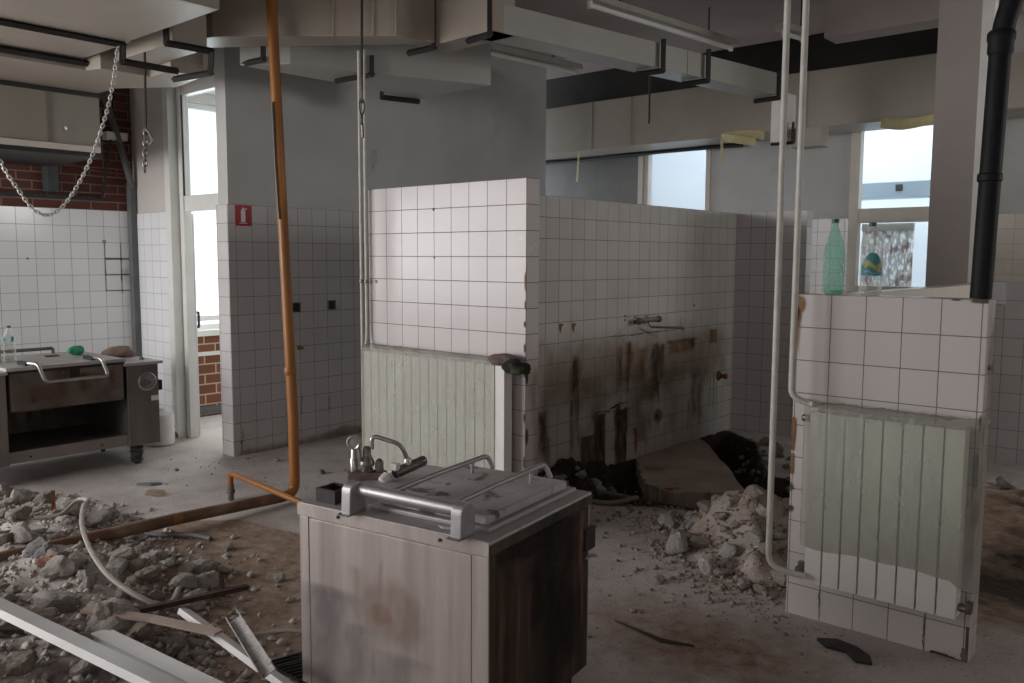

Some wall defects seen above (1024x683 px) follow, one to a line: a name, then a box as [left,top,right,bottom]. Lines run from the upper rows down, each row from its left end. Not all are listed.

peeling [581,404,628,465]